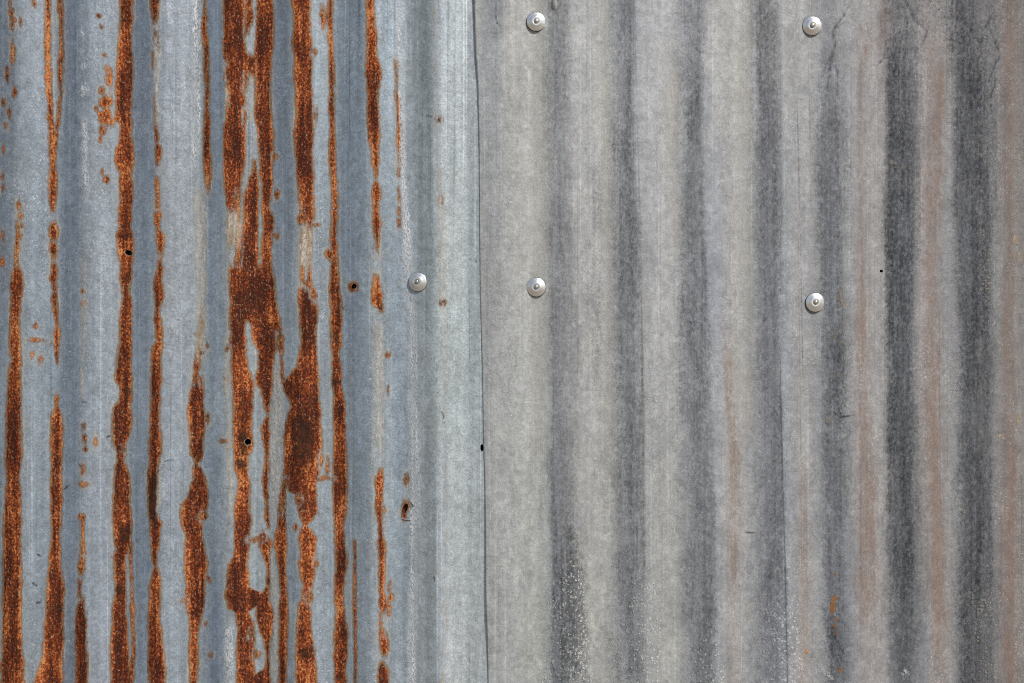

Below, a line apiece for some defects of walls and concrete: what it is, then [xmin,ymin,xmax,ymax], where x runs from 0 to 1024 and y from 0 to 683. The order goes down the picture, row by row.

corrosion [0,0,90,683]
corrosion [79,0,167,683]
corrosion [179,0,412,683]
corrosion [401,407,420,683]